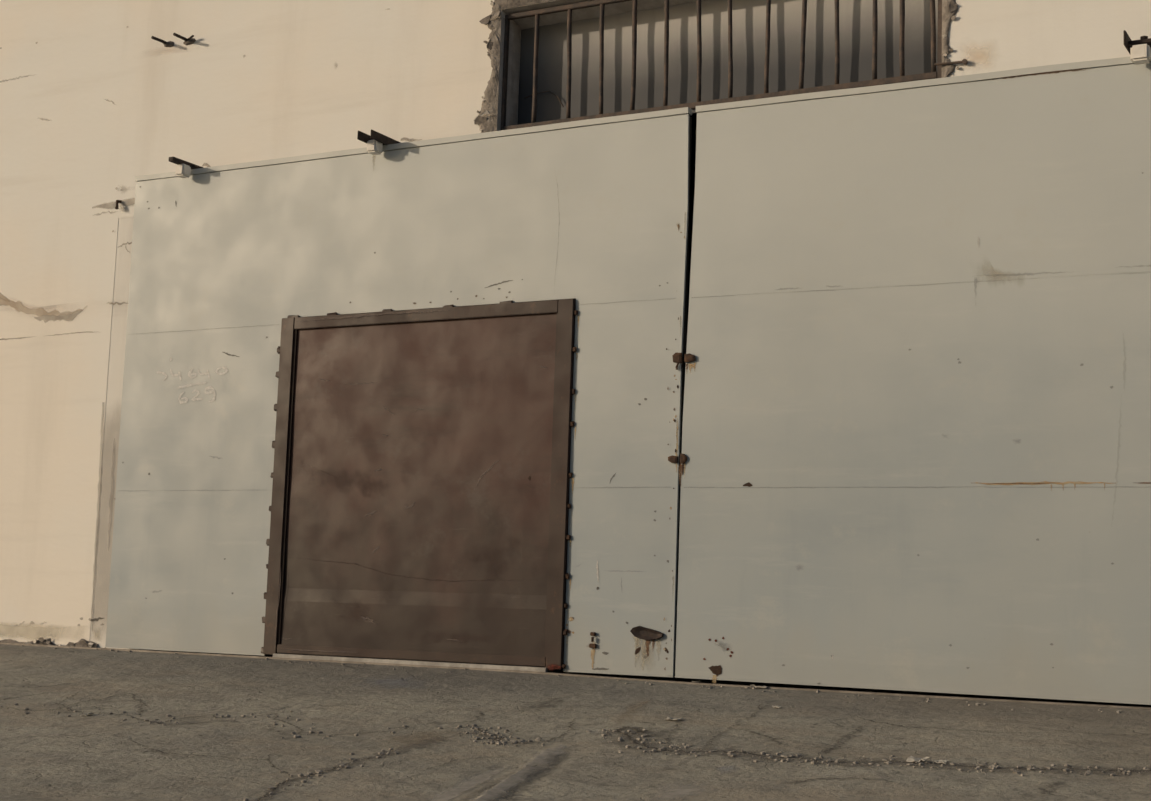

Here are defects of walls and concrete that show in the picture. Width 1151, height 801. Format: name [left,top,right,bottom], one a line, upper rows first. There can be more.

spalling [474,0,555,133]
spalling [942,0,959,78]
rust [668,408,686,489]
rust [703,637,733,682]
crack [3,683,576,801]
crack [615,703,1151,783]